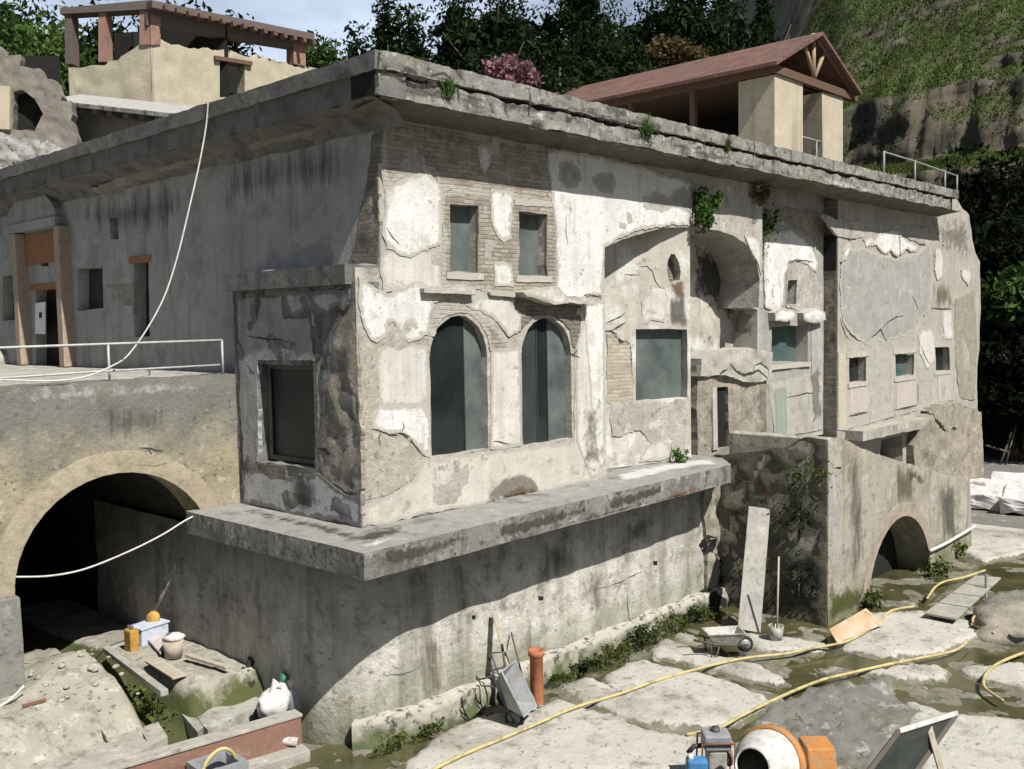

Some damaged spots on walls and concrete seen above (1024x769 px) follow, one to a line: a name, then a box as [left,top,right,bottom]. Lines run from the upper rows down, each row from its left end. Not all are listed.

crack [384,72,460,104]
flaking render [238,130,693,526]
flaking render [744,204,977,433]
crack [372,423,425,457]
damp [611,487,660,508]
damp [262,514,454,562]
damp [502,508,584,536]